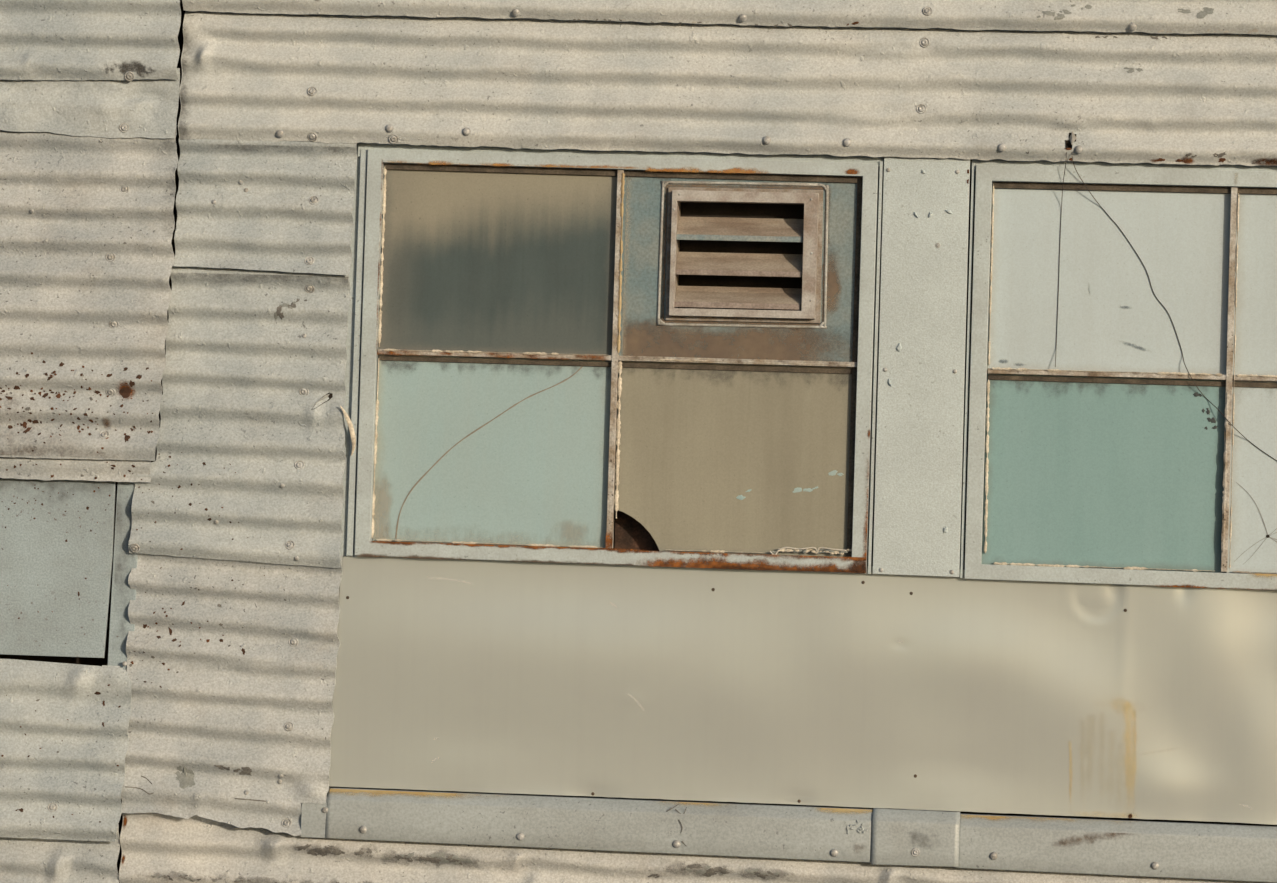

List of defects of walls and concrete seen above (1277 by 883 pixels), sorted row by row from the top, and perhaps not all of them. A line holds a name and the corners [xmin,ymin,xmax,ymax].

rust [0,352,200,542]
crack [395,366,583,539]
rust [372,474,869,573]
crack [1234,482,1277,563]